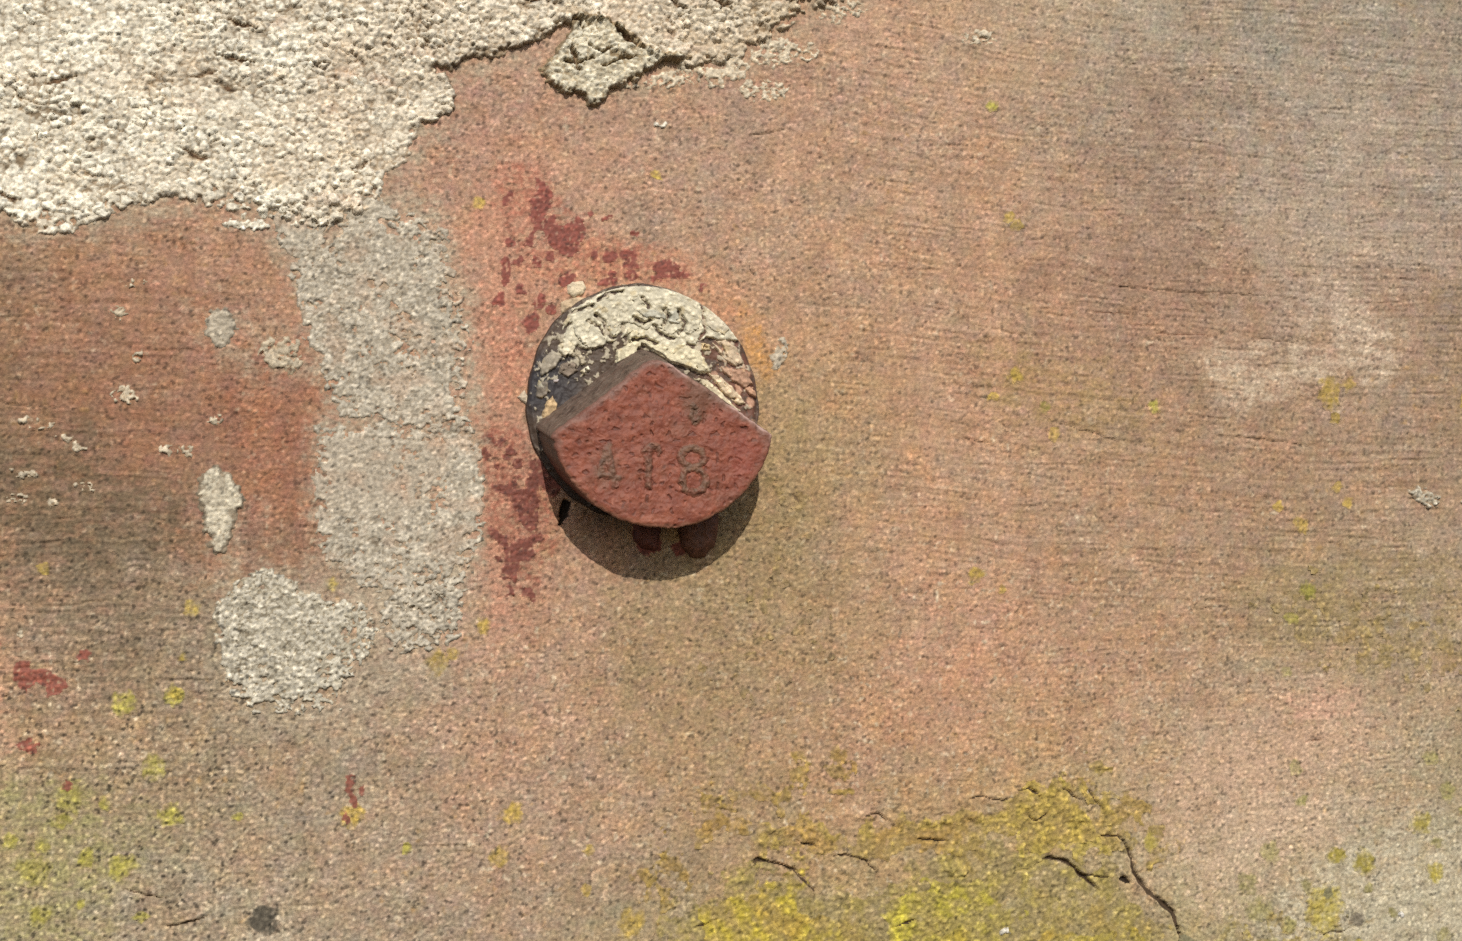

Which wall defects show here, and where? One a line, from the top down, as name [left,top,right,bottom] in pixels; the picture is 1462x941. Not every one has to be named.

flaking render [0,0,844,236]
corrosion [456,149,785,652]
crack [751,842,877,892]
crack [971,788,1181,938]